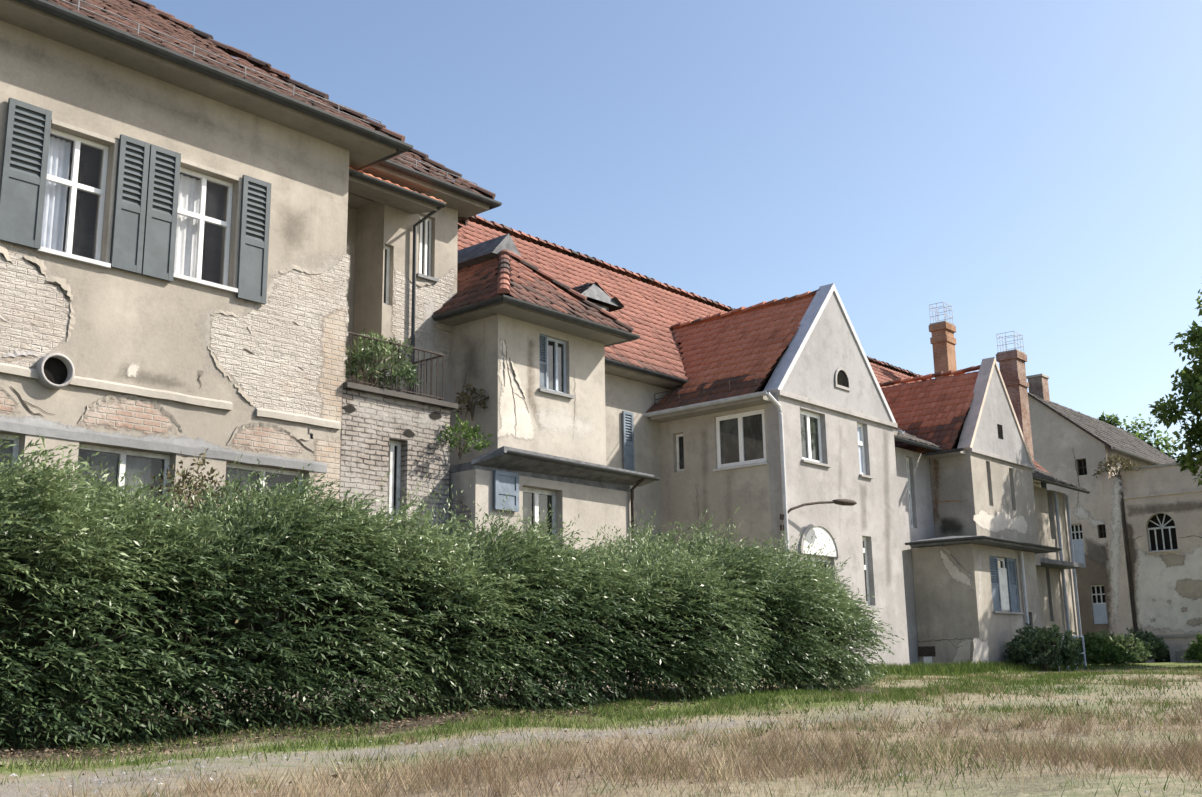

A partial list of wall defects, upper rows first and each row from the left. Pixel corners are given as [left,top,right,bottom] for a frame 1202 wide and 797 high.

peeling [0,242,356,519]
crack [505,343,529,437]
peeling [973,509,1028,535]
peeling [1073,477,1123,621]
peeling [1135,545,1202,634]